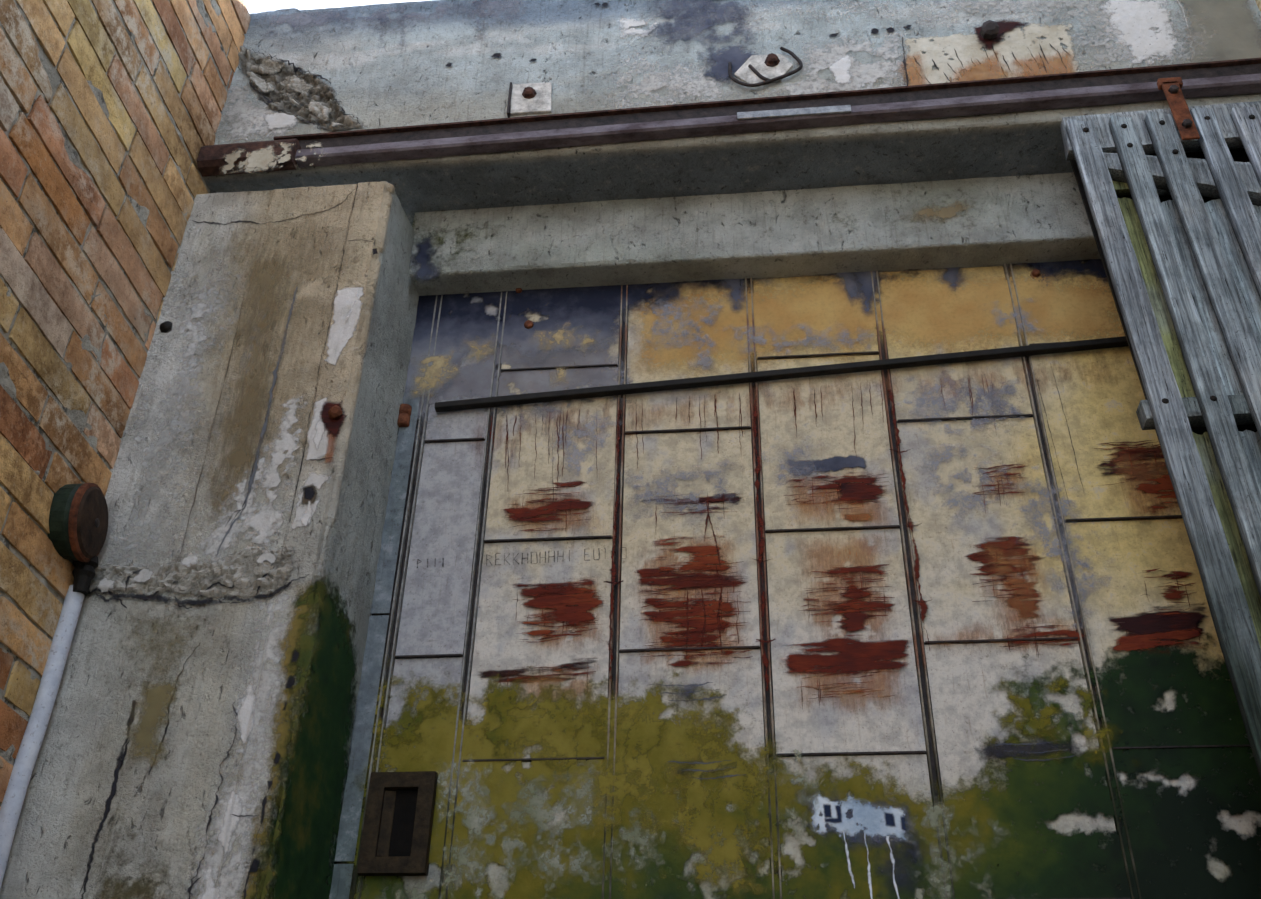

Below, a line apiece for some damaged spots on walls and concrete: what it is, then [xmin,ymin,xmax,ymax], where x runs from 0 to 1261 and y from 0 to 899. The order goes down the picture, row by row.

spalling [222,46,363,174]
damp [617,0,759,109]
damp [925,0,1202,69]
crack [80,644,200,899]
spalling [85,546,294,598]
crack [88,287,310,609]
damp [187,587,293,899]
crack [194,183,373,522]
peeling [292,398,329,529]
rust [479,399,644,697]
rust [637,394,776,691]
rust [785,540,909,710]